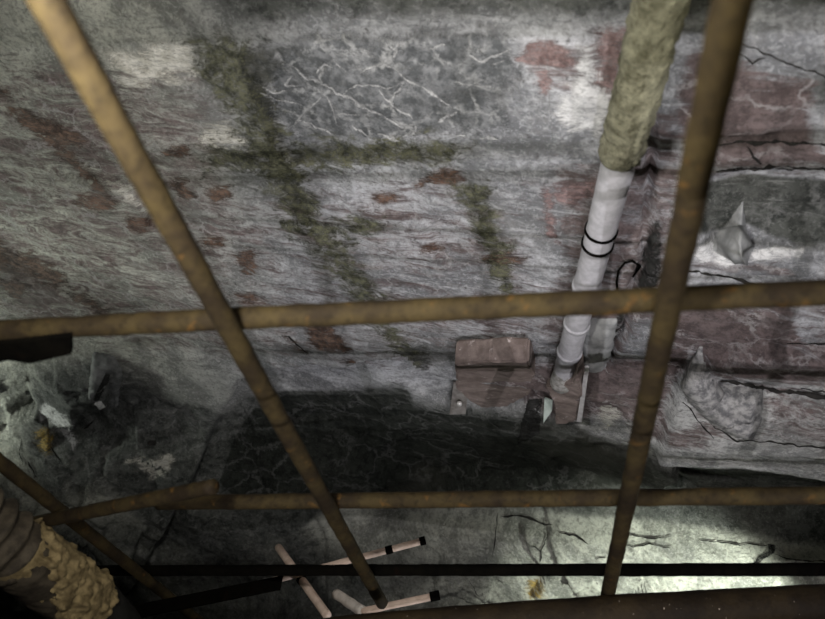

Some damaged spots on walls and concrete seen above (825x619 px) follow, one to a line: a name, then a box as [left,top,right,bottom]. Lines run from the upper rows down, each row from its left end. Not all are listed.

corrosion [514,40,579,93]
crack [742,45,825,78]
damp [106,31,471,301]
damp [449,179,516,294]
damp [365,324,430,371]
crack [712,380,825,400]
crack [682,402,825,449]
crack [492,514,607,561]
crack [627,534,672,548]
crack [699,540,825,562]